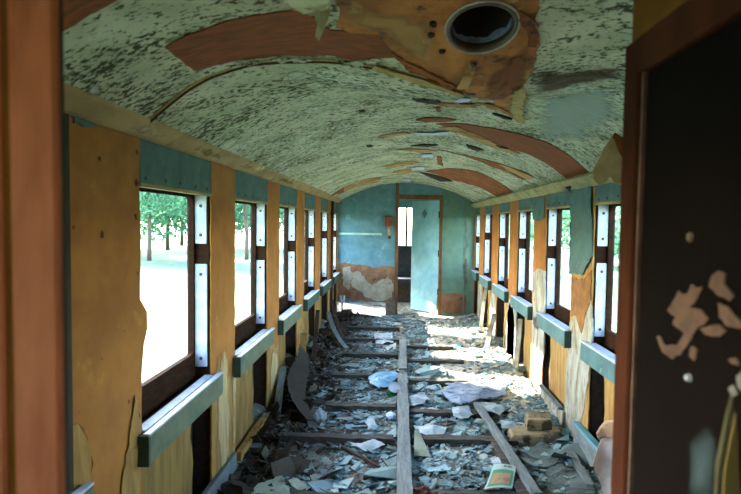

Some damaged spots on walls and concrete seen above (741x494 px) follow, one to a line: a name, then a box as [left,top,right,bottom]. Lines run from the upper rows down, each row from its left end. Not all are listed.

peeling [165,0,395,71]
peeling [433,98,508,113]
peeling [384,149,535,196]
peeling [378,123,589,178]
peeling [337,262,395,303]
peeling [564,186,594,436]
peeling [656,271,741,361]
peeling [73,423,93,489]
peeling [121,395,142,494]